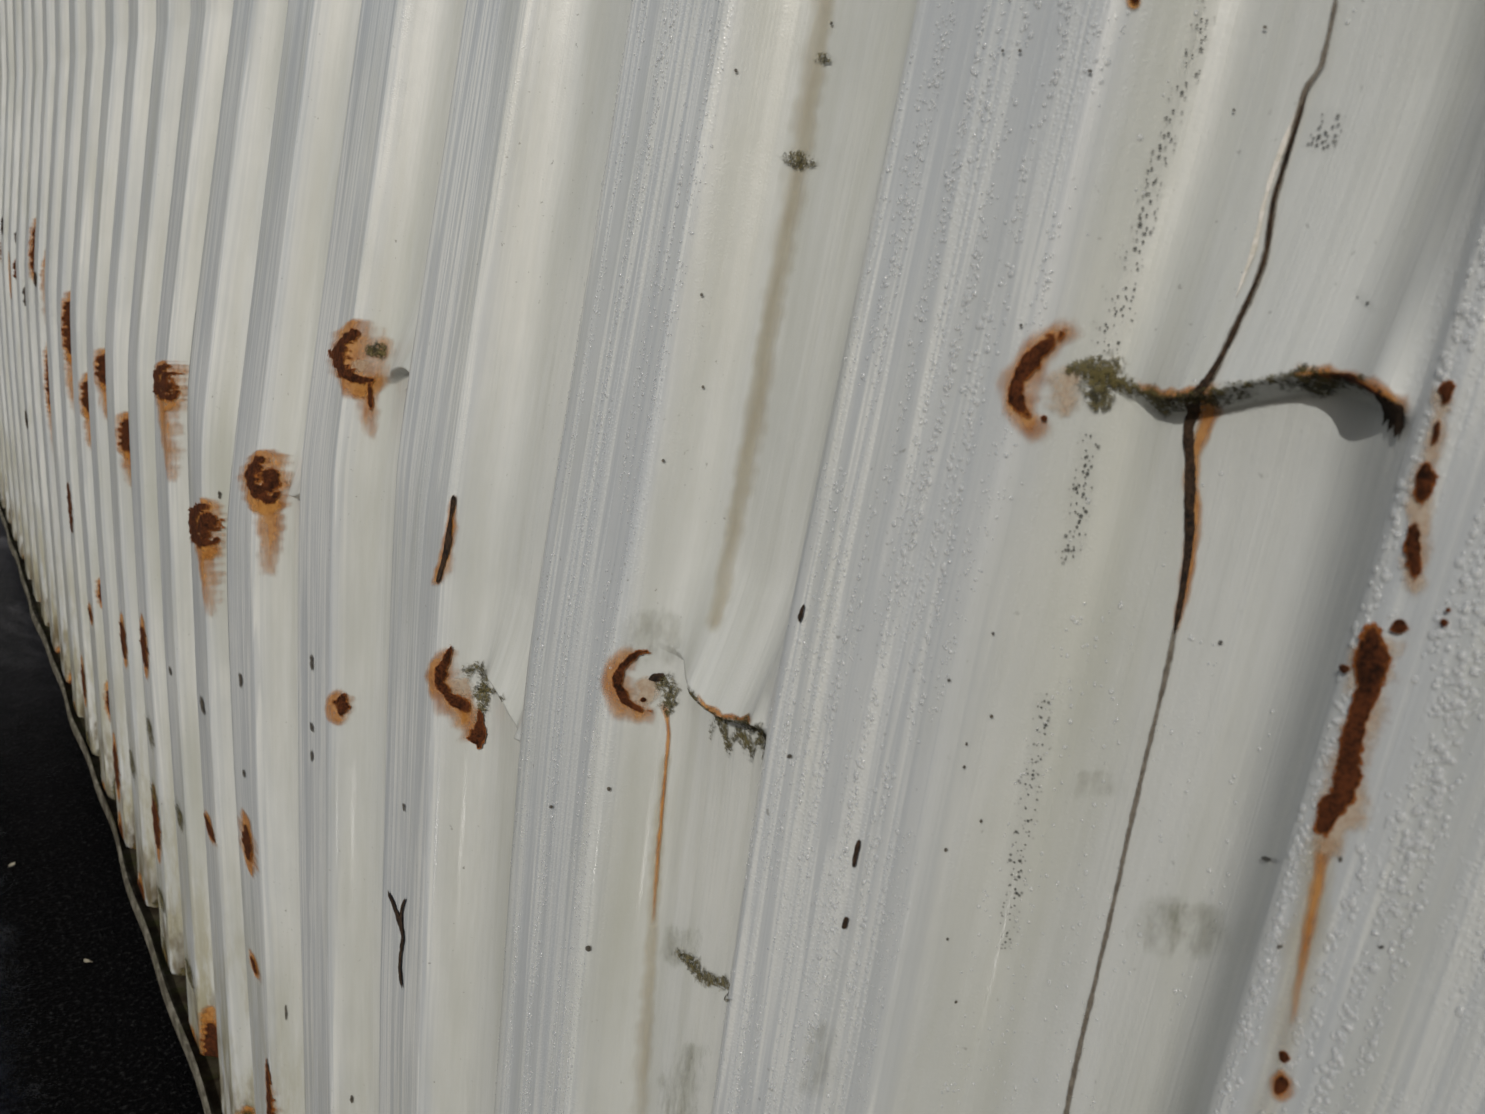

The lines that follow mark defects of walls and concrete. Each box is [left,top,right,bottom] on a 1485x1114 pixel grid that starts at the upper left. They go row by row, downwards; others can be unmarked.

corrosion [152,360,186,463]
corrosion [328,319,387,422]
corrosion [1006,327,1078,435]
corrosion [188,498,225,597]
corrosion [243,450,290,563]
crack [1063,0,1338,1114]
corrosion [1403,380,1456,591]
corrosion [427,646,487,749]
corrosion [603,649,670,903]
corrosion [1299,619,1409,978]